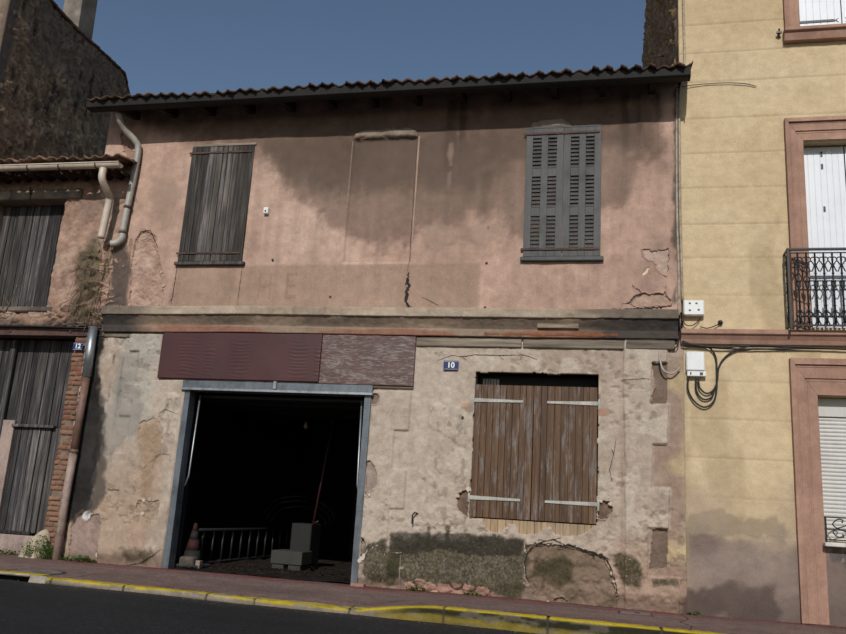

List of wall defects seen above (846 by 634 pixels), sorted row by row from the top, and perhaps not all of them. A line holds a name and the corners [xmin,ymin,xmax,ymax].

crack [404,140,439,308]
peeling [641,246,670,276]
peeling [628,288,673,308]
spalling [364,459,380,498]
spalling [455,487,472,519]
spalling [596,499,614,521]